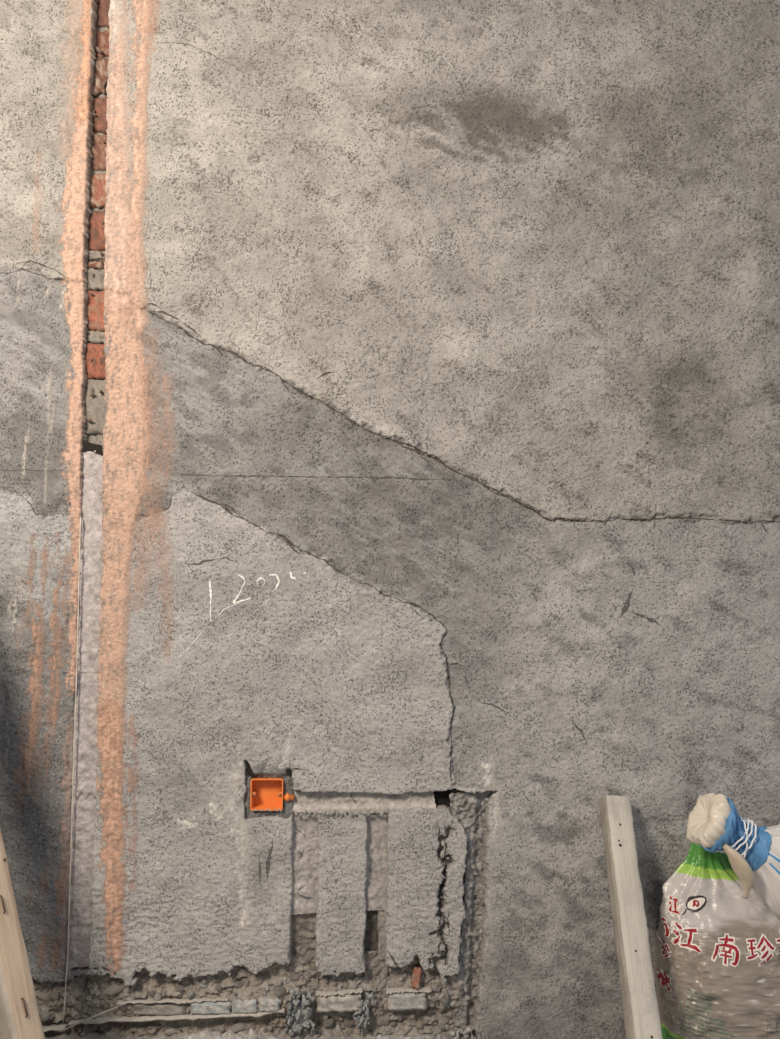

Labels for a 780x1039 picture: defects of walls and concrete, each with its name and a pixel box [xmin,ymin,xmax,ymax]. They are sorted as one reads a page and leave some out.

crack [0,260,780,781]
crack [431,824,450,963]